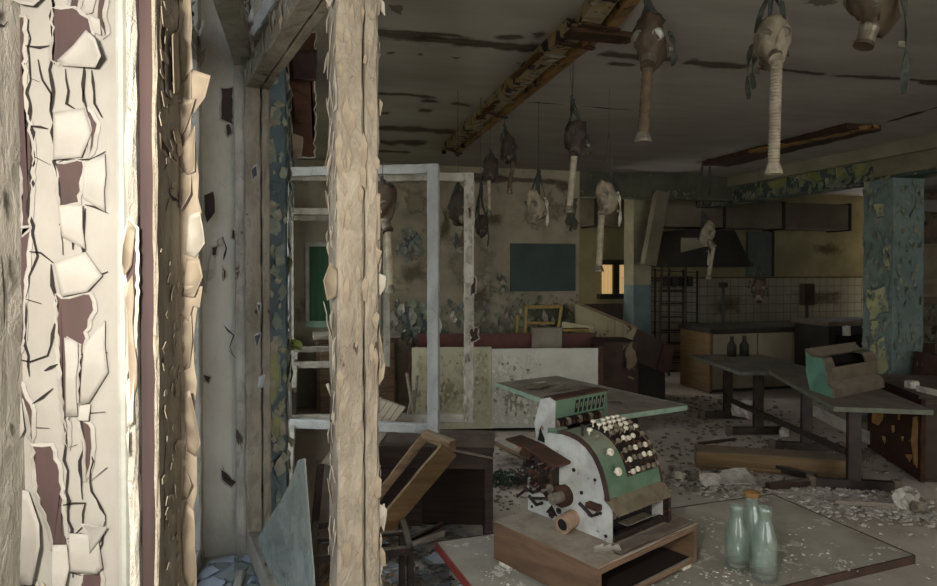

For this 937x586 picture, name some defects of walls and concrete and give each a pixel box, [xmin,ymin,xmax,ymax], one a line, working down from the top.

peeling [48,0,110,68]
water stain [378,29,545,52]
peeling [13,0,40,354]
crack [0,0,107,404]
peeling [20,104,108,586]
peeling [121,217,140,454]
peeling [159,0,236,586]
peeling [258,0,427,504]
peeling [865,285,890,374]
crack [59,405,107,549]
peeling [328,516,362,569]
peeling [355,463,387,586]